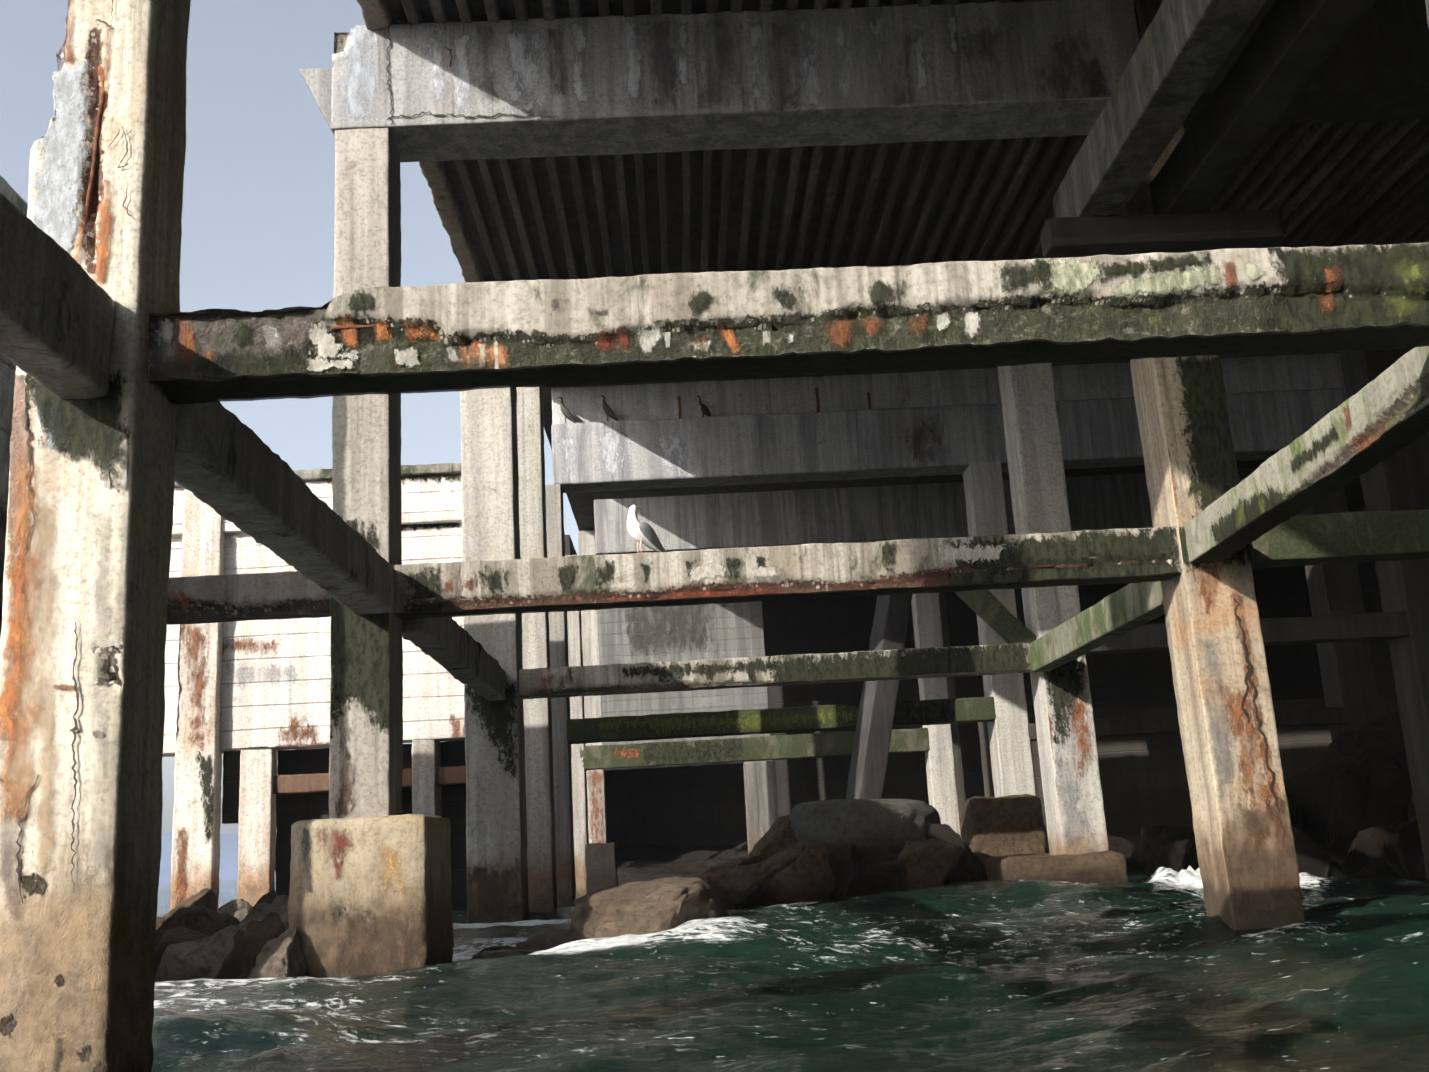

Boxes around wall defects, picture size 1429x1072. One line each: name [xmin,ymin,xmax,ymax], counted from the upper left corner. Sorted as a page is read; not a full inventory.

peeling [31,6,108,274]
crack [386,27,559,125]
corrosion [722,328,739,353]
corrosion [826,318,881,347]
leakage [937,312,980,337]
corrosion [1223,262,1237,292]
corrosion [0,458,41,820]
crack [0,622,79,904]
corrosion [167,592,276,750]
corrosion [1220,592,1288,862]
crack [1233,598,1286,850]
corrosion [175,828,187,907]